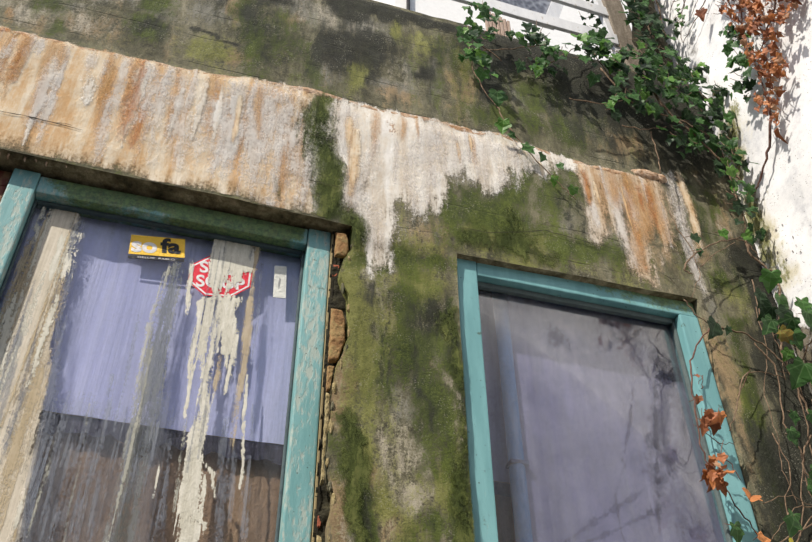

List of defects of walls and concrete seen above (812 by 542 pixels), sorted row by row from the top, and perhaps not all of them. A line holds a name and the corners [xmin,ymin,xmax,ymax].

damp [0,26,703,288]
spalling [313,231,354,542]
damp [343,477,362,533]
damp [793,326,812,364]